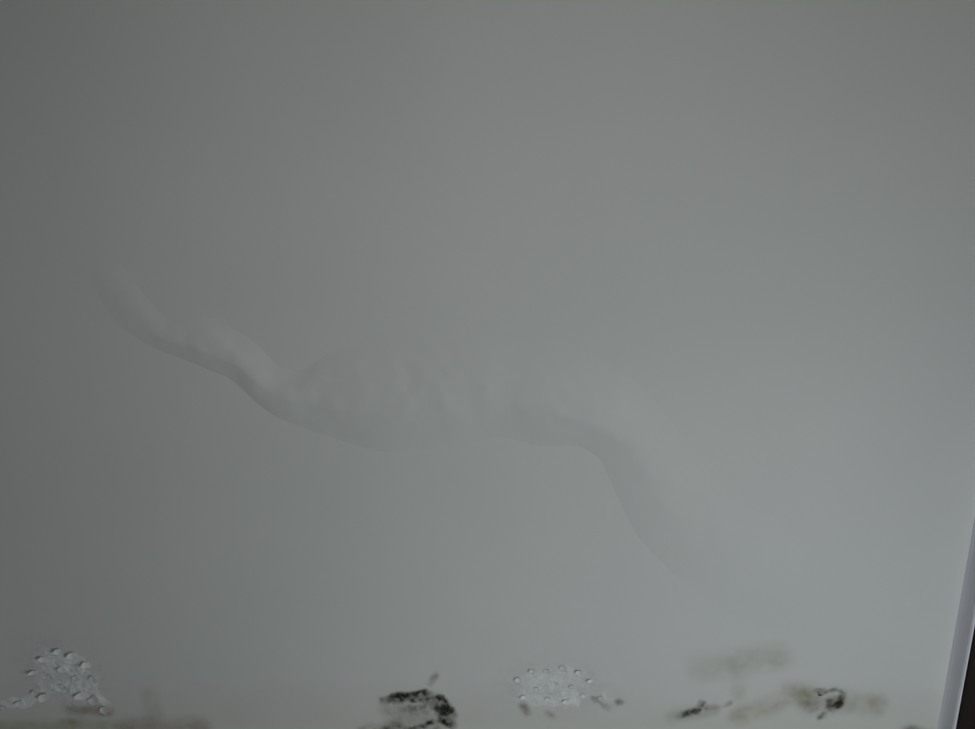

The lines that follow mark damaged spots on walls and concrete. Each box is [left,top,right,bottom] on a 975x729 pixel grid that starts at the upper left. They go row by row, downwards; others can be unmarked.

water stain [391,690,454,728]